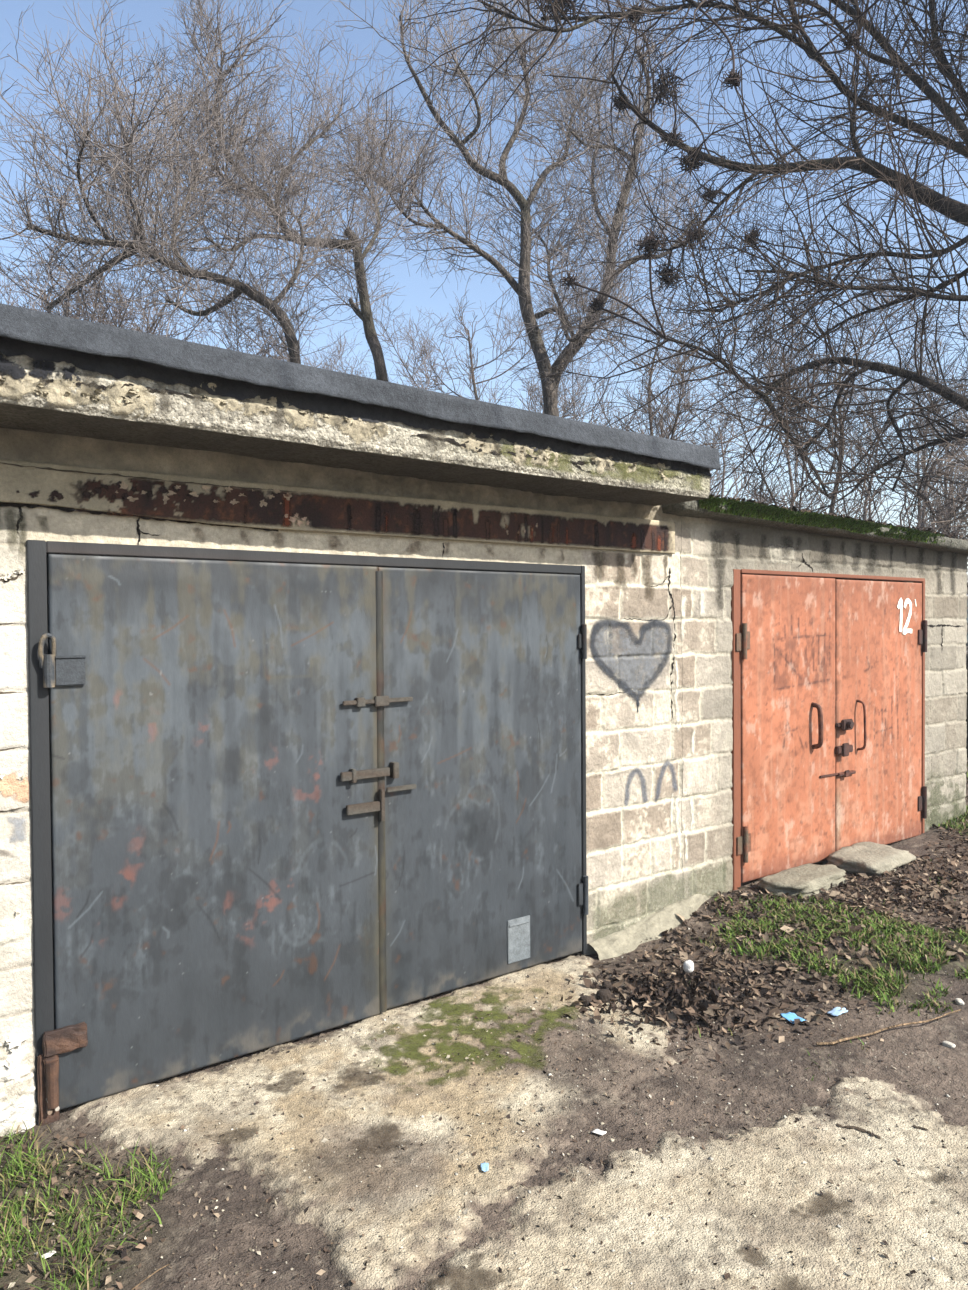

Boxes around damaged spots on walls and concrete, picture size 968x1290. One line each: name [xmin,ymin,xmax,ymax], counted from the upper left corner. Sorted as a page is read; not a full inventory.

spalling [0,351,156,417]
spalling [190,383,388,444]
spalling [460,432,562,467]
spalling [587,453,637,474]
peeling [115,481,310,527]
damp [822,541,956,593]
peeling [0,773,29,803]